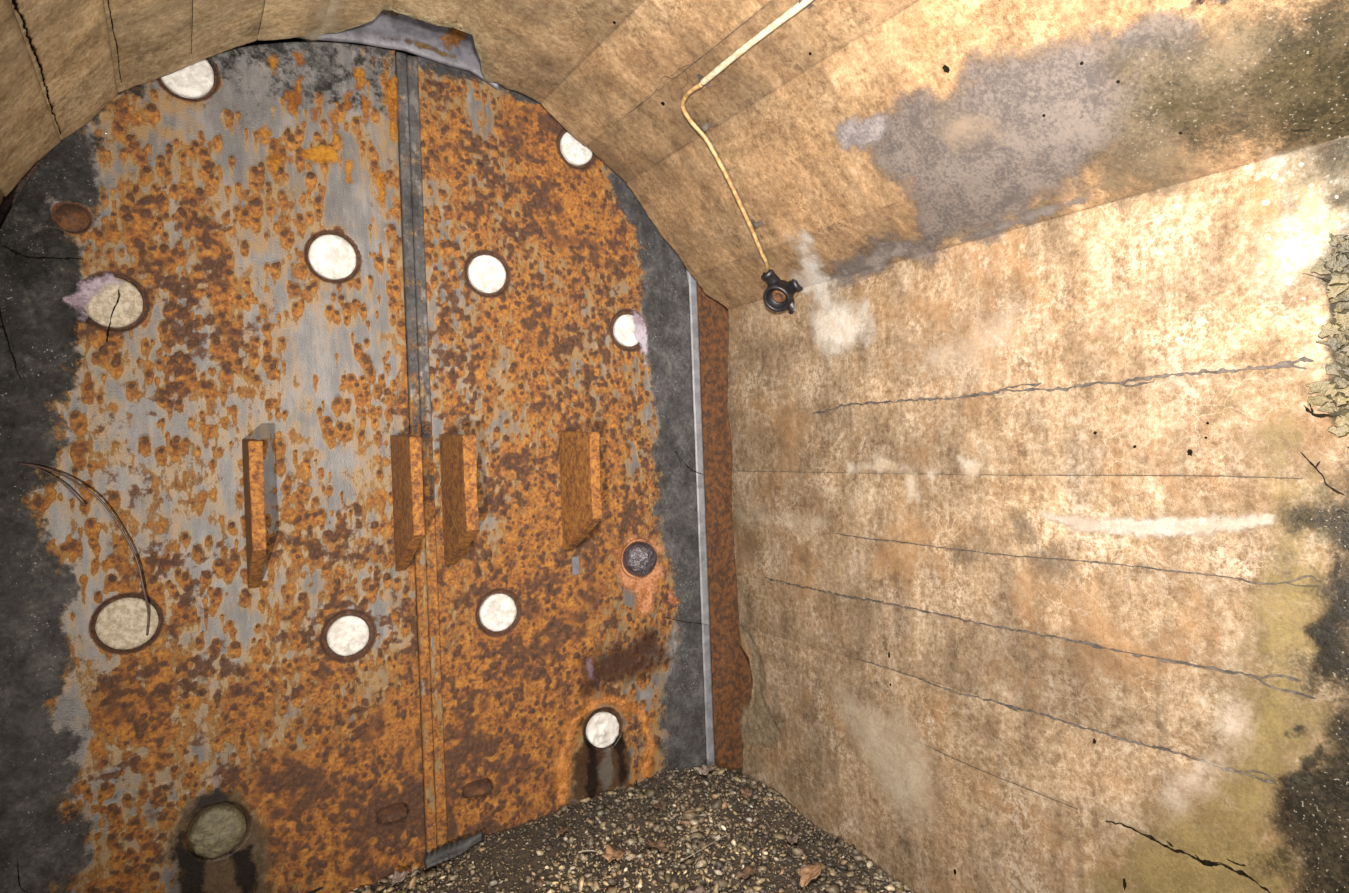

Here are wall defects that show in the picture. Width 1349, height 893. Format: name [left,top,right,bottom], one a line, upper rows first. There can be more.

crack [12,0,61,134]
corrosion [257,52,369,183]
corrosion [386,77,398,142]
damp [791,0,1349,352]
crack [813,357,1314,414]
crack [1303,403,1342,419]
peeling [1306,233,1349,448]
corrosion [553,629,667,804]
corrosion [614,536,679,615]
crack [764,577,1316,699]
damp [1099,491,1349,893]
crack [846,714,1270,893]